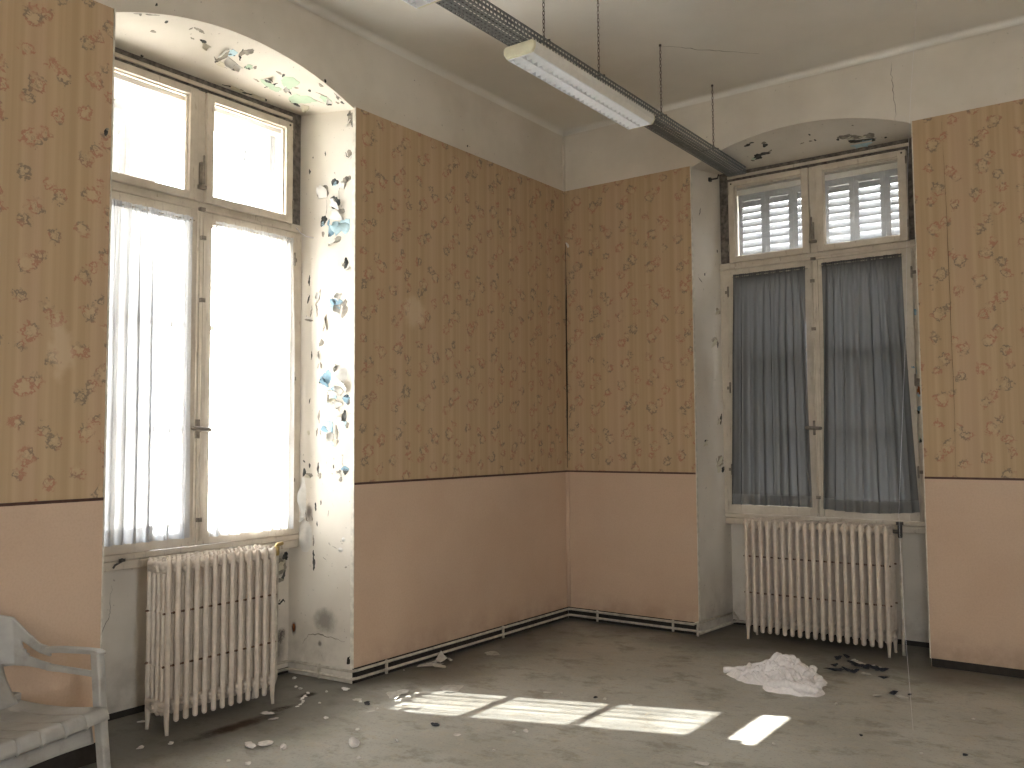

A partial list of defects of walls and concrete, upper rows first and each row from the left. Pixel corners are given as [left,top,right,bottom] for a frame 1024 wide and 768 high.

peeling [189,27,353,127]
peeling [744,142,772,161]
peeling [836,125,887,149]
peeling [316,176,351,246]
peeling [320,293,348,318]
peeling [307,364,350,447]